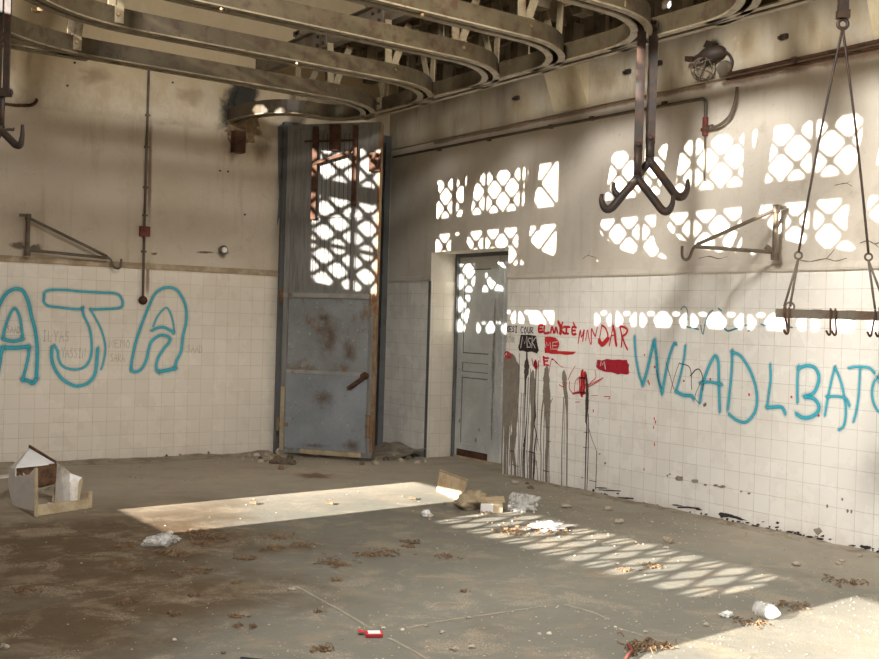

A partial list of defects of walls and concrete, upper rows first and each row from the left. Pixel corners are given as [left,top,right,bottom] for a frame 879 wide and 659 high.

spalling [719,512,831,540]